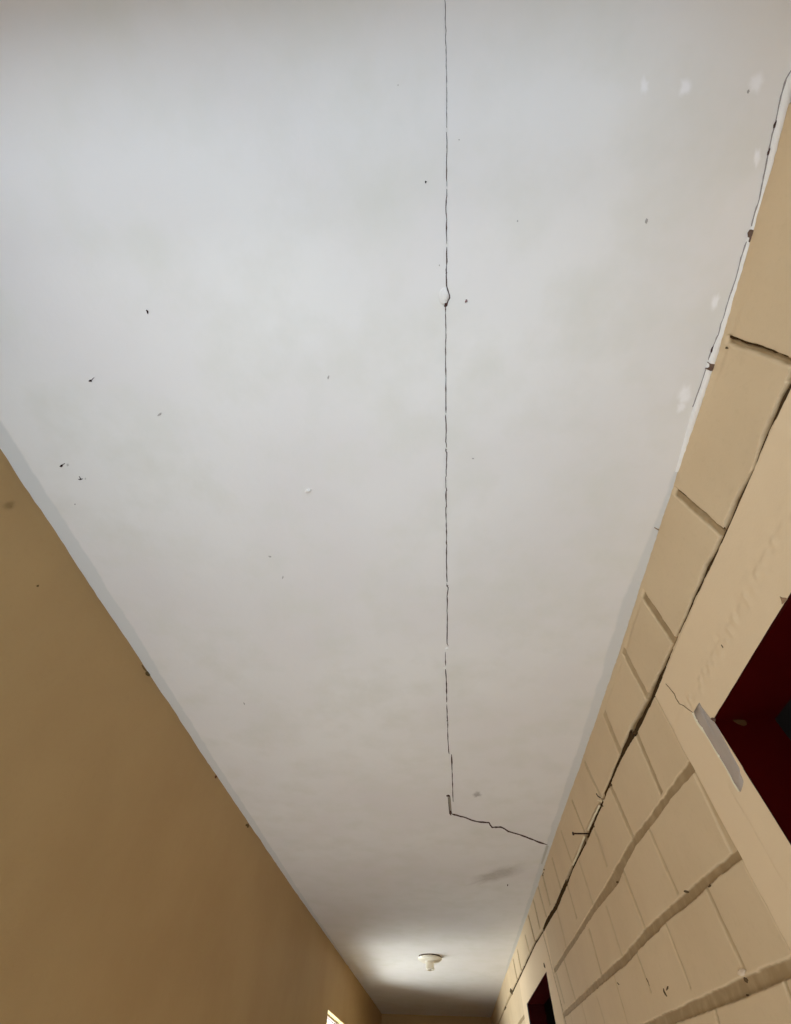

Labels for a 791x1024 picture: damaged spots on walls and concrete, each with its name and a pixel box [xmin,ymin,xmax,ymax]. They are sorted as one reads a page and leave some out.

crack [442,69,549,864]
crack [504,384,791,1010]
crack [692,71,791,407]